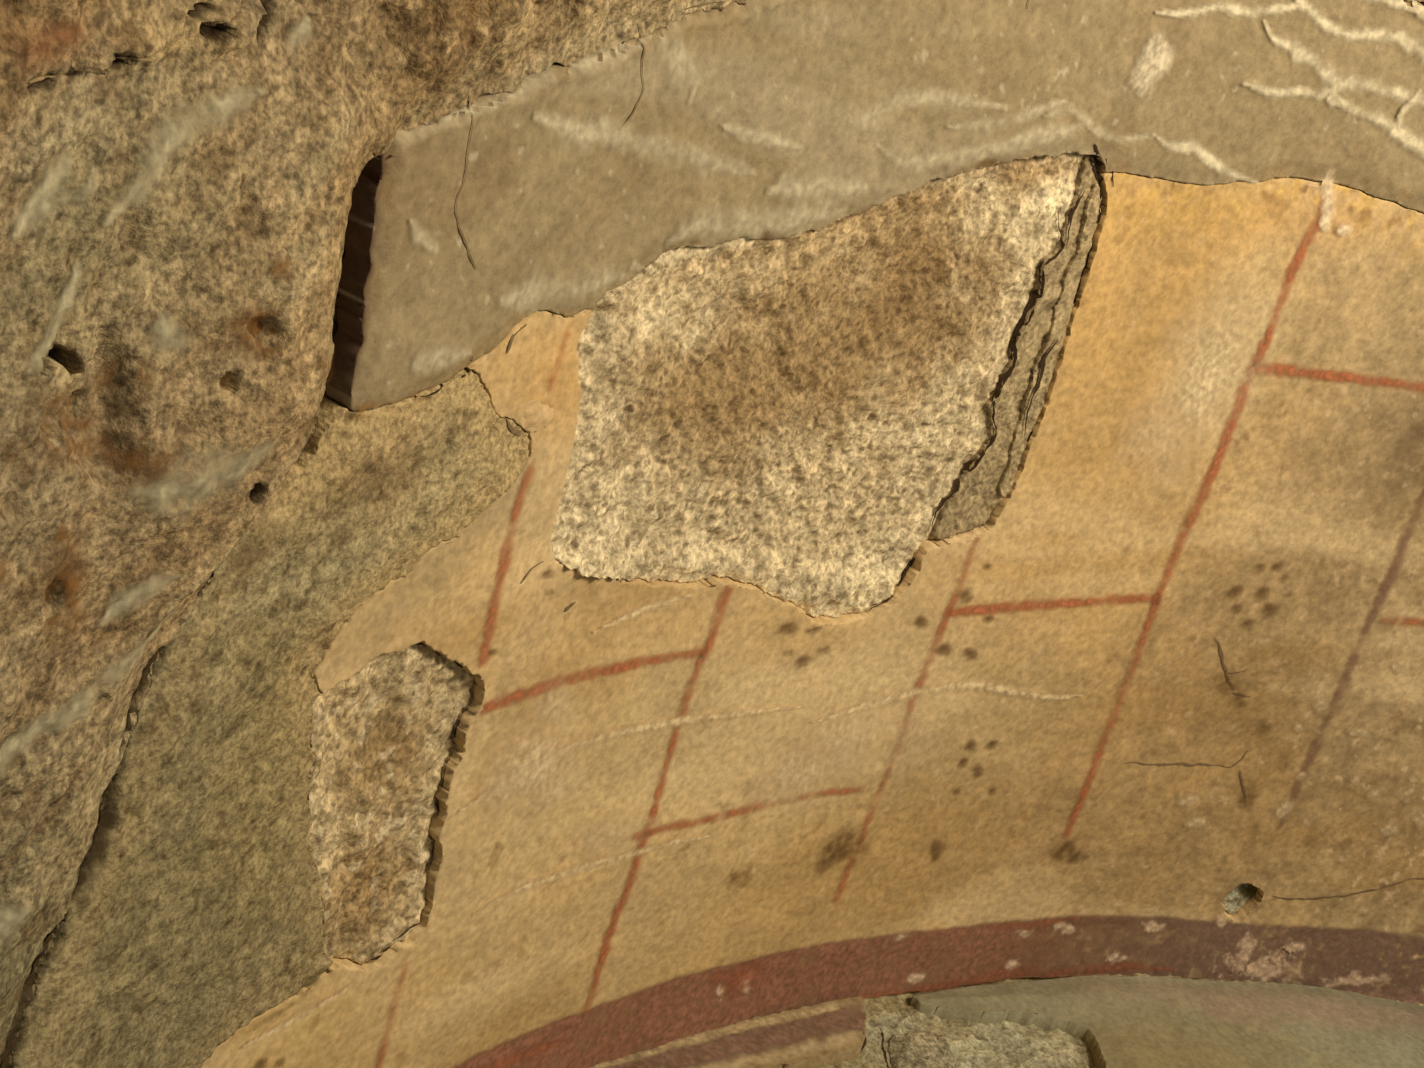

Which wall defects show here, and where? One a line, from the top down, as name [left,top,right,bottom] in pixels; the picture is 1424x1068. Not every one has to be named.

leakage [1131,34,1173,95]
flaking render [551,152,1102,618]
flaking render [308,642,475,966]